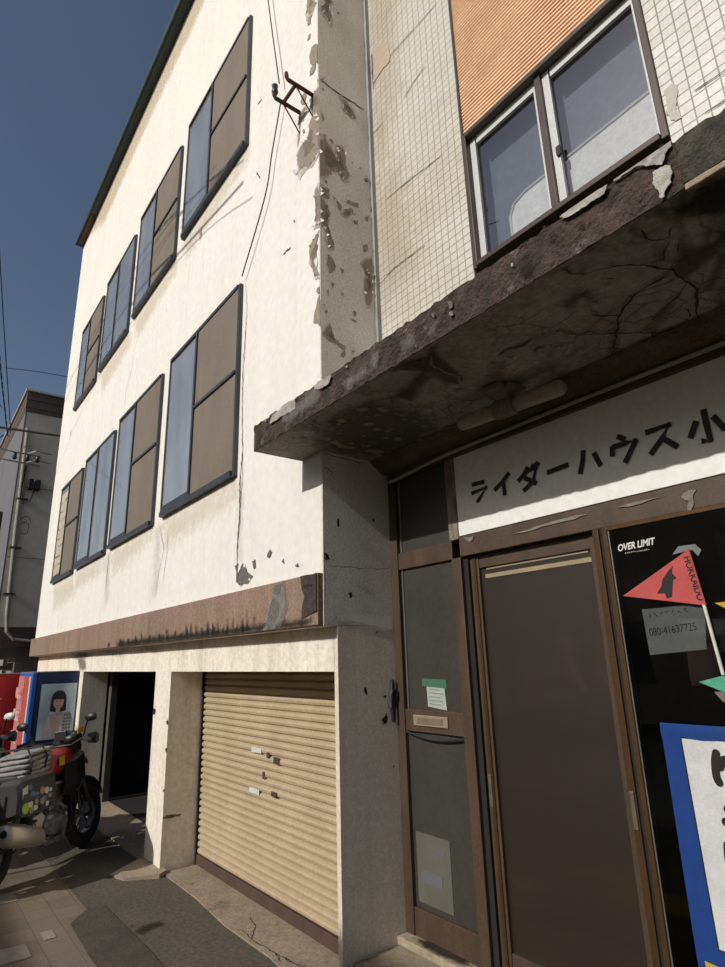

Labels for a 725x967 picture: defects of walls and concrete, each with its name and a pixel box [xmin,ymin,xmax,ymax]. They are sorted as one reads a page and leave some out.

peeling [292,0,369,368]
spalling [560,141,673,218]
water stain [657,178,725,290]
peeling [351,244,374,322]
crack [555,229,725,354]
peeling [263,399,296,424]
water stain [315,348,463,458]
water stain [108,619,308,647]
spalling [234,560,256,586]
peeling [264,583,286,630]
spalling [282,559,317,623]
crack [241,917,306,967]